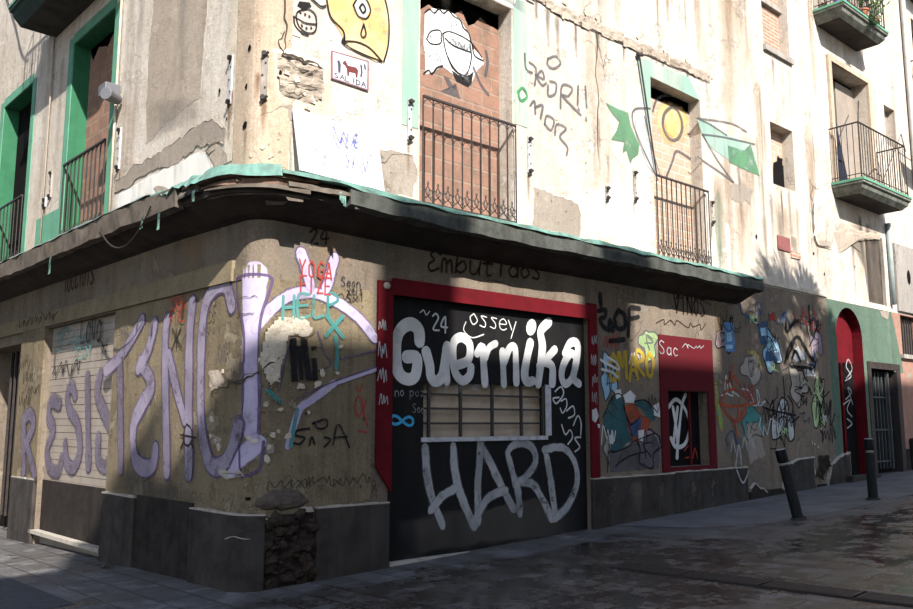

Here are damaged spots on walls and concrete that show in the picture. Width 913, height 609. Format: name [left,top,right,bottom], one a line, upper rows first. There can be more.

peeling [146,0,209,144]
crack [278,0,288,75]
spalling [249,48,332,170]
peeling [114,118,228,193]
spalling [257,312,316,389]
spalling [297,369,339,392]